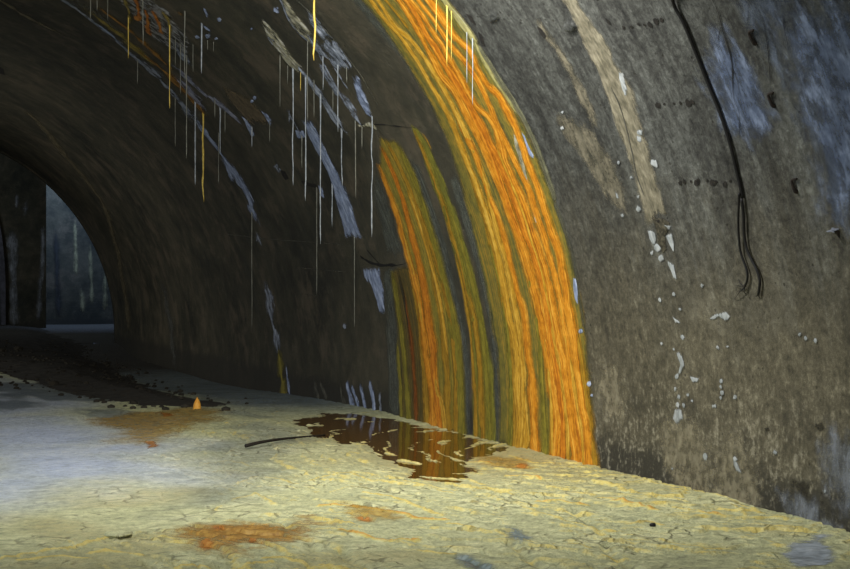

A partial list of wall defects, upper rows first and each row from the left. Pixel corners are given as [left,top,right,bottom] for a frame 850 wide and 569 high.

water stain [61,0,400,413]
corrosion [363,0,598,466]
water stain [539,24,625,209]
crack [712,0,746,122]
water stain [712,35,773,133]
water stain [790,0,850,222]
corrosion [487,457,530,469]